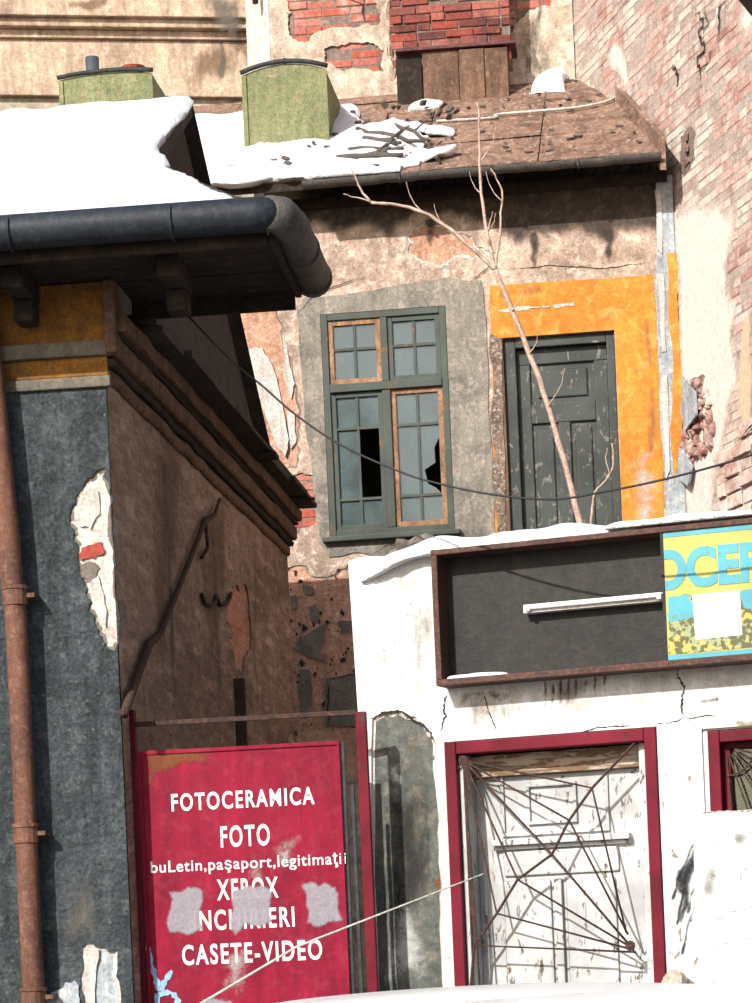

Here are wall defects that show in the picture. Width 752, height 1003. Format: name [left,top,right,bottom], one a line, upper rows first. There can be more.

flaking render [287,0,396,81]
flaking render [509,0,551,32]
crack [672,0,726,91]
flaking render [406,225,500,268]
flaking render [655,190,752,514]
flaking render [69,468,121,650]
flaking render [288,565,358,784]
leakage [545,677,606,696]
crack [583,724,630,732]
crack [655,670,715,727]
efflorescence [392,914,419,969]
flaking render [47,943,121,1003]